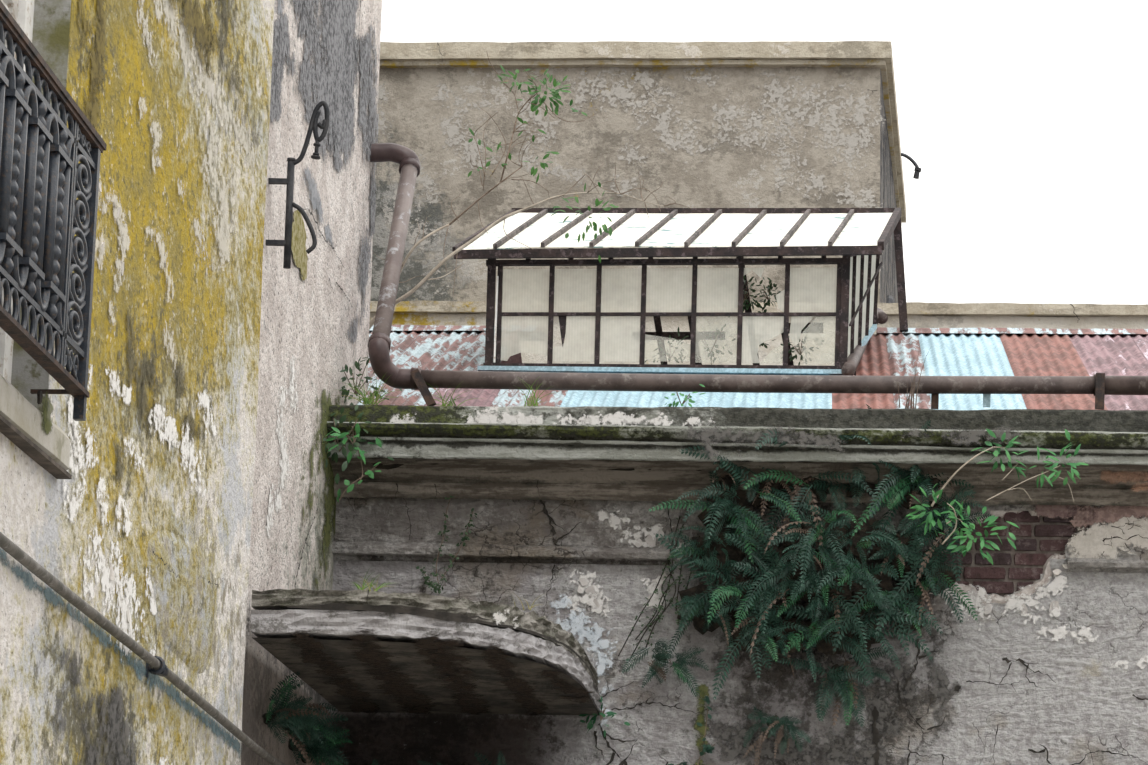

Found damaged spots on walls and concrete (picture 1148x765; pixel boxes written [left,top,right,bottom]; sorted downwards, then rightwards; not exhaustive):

peeling [136,0,260,274]
water stain [270,0,379,343]
peeling [95,173,129,325]
water stain [390,414,416,423]
water stain [467,406,715,426]
flaking render [598,509,690,560]
flaking render [926,505,1148,606]
water stain [0,549,242,765]
crack [288,480,703,765]
crack [872,639,956,765]
crack [966,657,1056,691]
crack [1028,736,1146,765]